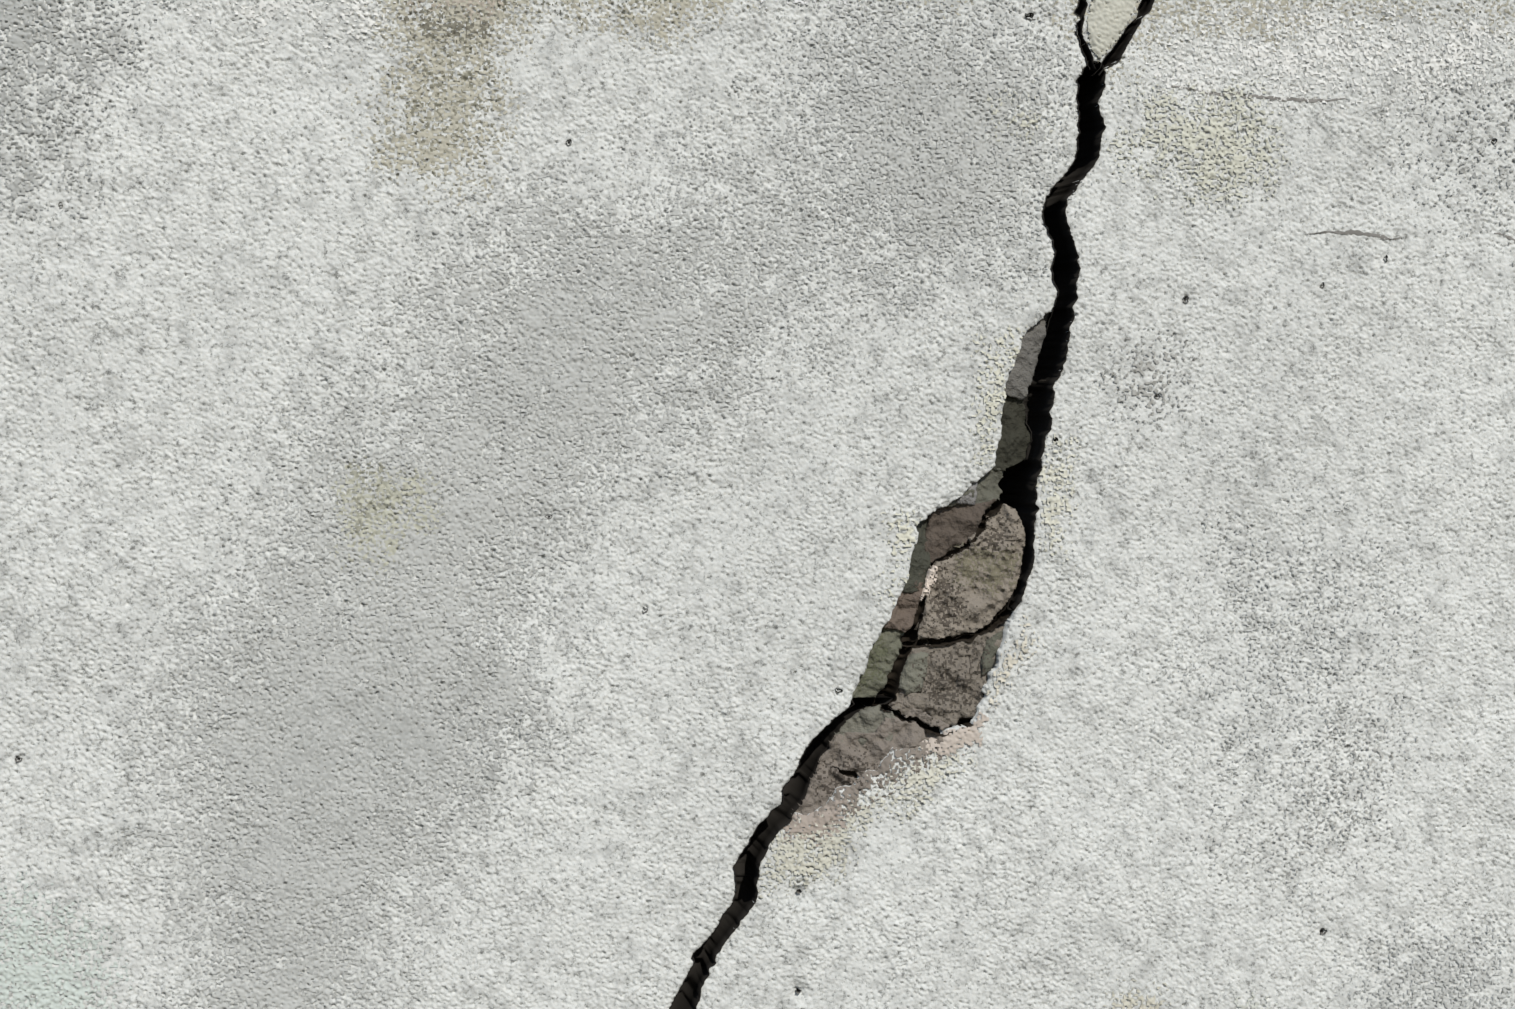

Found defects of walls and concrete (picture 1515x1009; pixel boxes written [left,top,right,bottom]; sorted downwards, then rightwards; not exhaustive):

flaking render [758,312,1049,901]
crack [669,0,1155,1009]